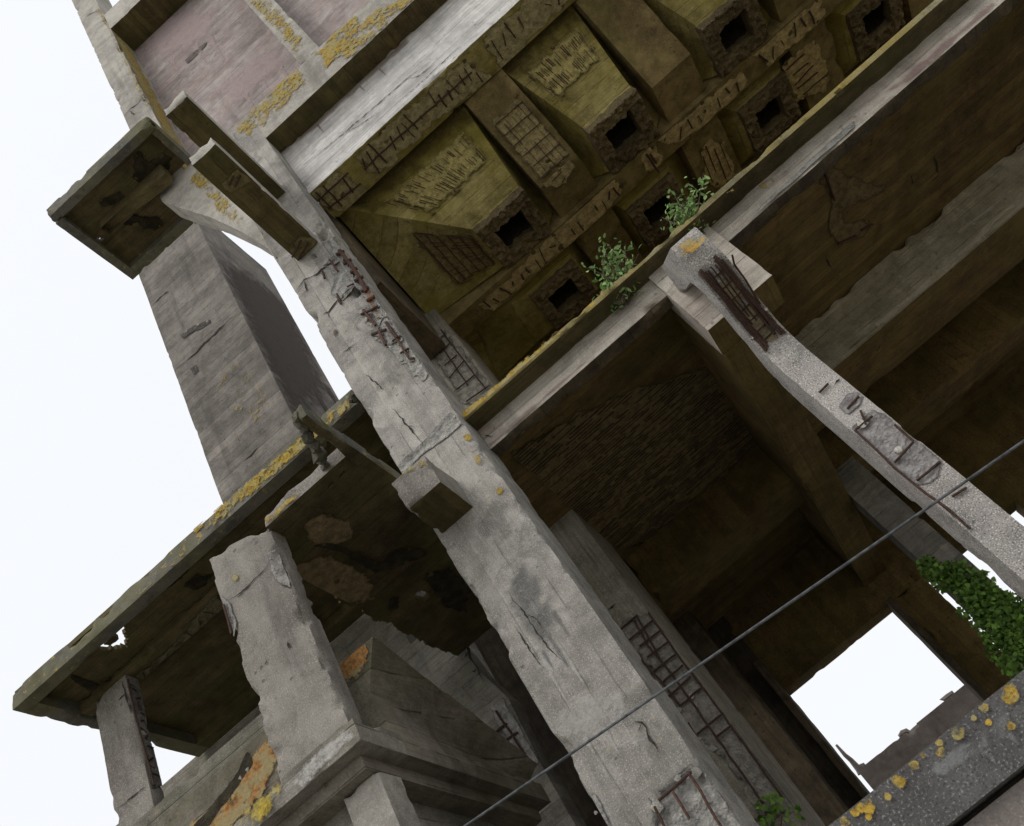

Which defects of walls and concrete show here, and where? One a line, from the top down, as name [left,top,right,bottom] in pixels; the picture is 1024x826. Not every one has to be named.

spalling [312,0,575,215]
spalling [412,232,496,285]
spalling [477,180,624,311]
spalling [698,255,786,352]
spalling [839,392,971,530]
crack [509,594,565,665]
spalling [620,612,794,826]